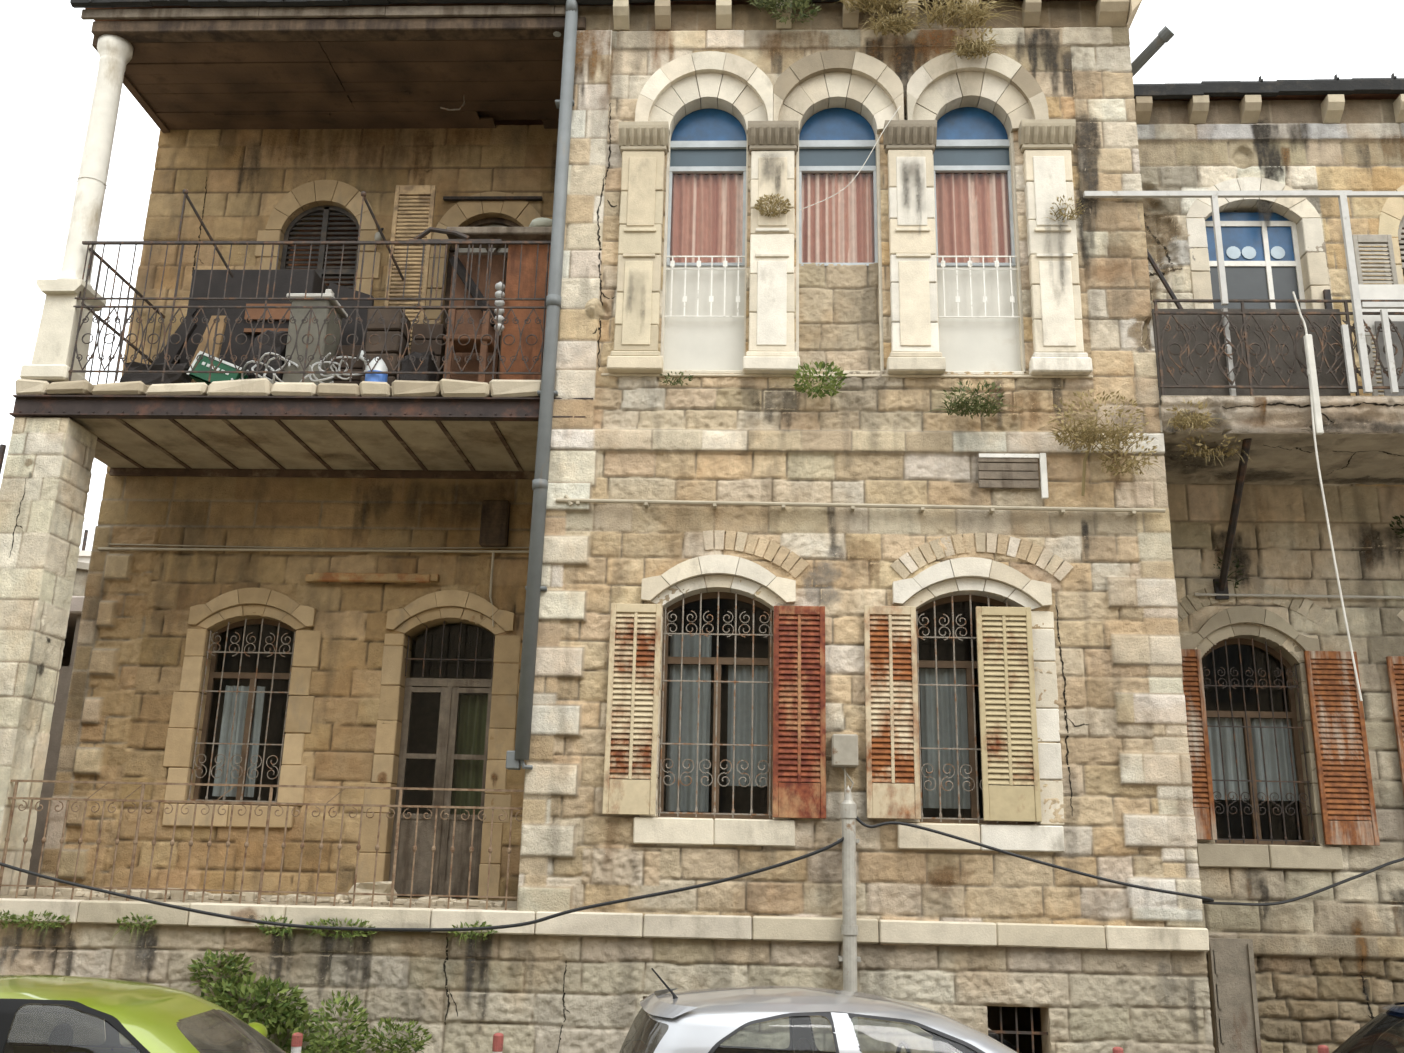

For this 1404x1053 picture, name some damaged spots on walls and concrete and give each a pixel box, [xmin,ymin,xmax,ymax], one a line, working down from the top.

crack [9,478,26,557]